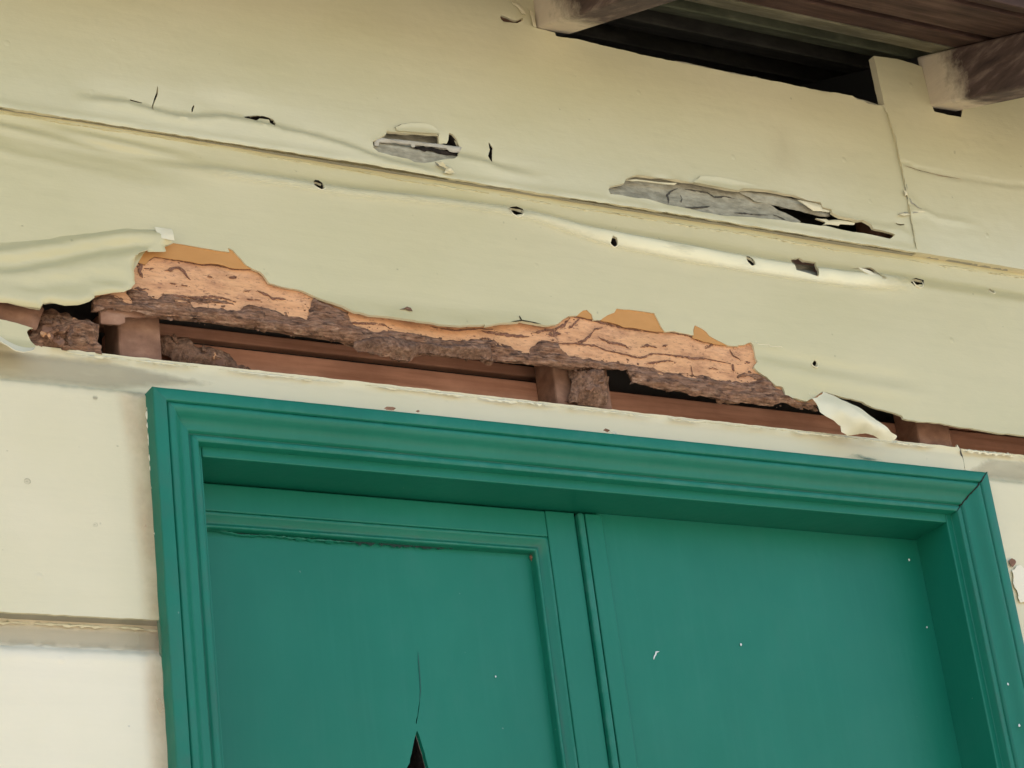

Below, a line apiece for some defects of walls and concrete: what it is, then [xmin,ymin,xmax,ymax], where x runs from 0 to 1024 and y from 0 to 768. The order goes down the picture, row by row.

peeling [395,123,440,134]
peeling [694,176,778,192]
peeling [797,200,829,213]
peeling [0,227,175,348]
peeling [213,352,225,366]
peeling [809,392,897,441]